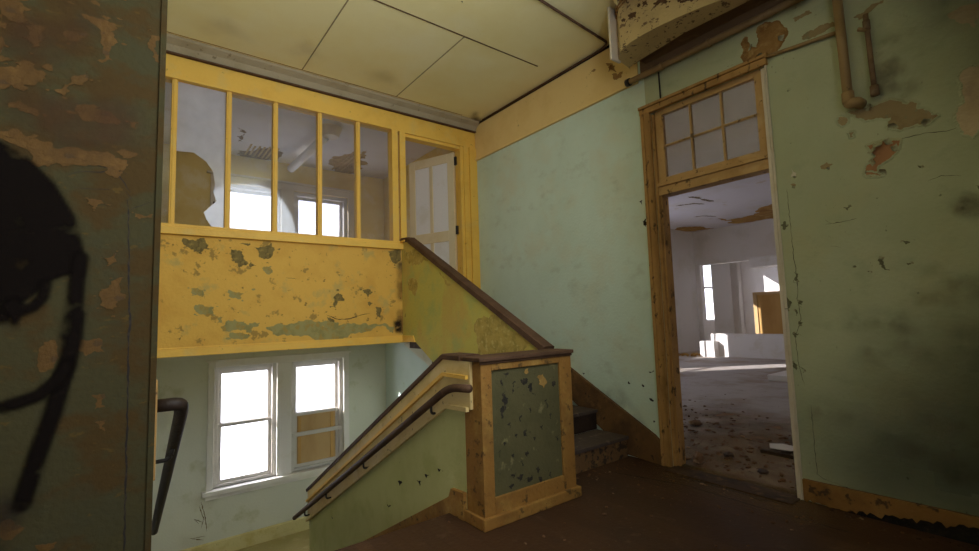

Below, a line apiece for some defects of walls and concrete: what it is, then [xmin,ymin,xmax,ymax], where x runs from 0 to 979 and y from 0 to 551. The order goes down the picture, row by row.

peeling [0,0,93,99]
peeling [63,0,127,63]
peeling [621,0,693,22]
flaking render [740,10,812,62]
peeling [0,128,138,178]
peeling [835,97,941,179]
peeling [182,238,209,254]
peeling [230,243,280,274]
peeling [191,288,394,340]
peeling [500,368,556,440]